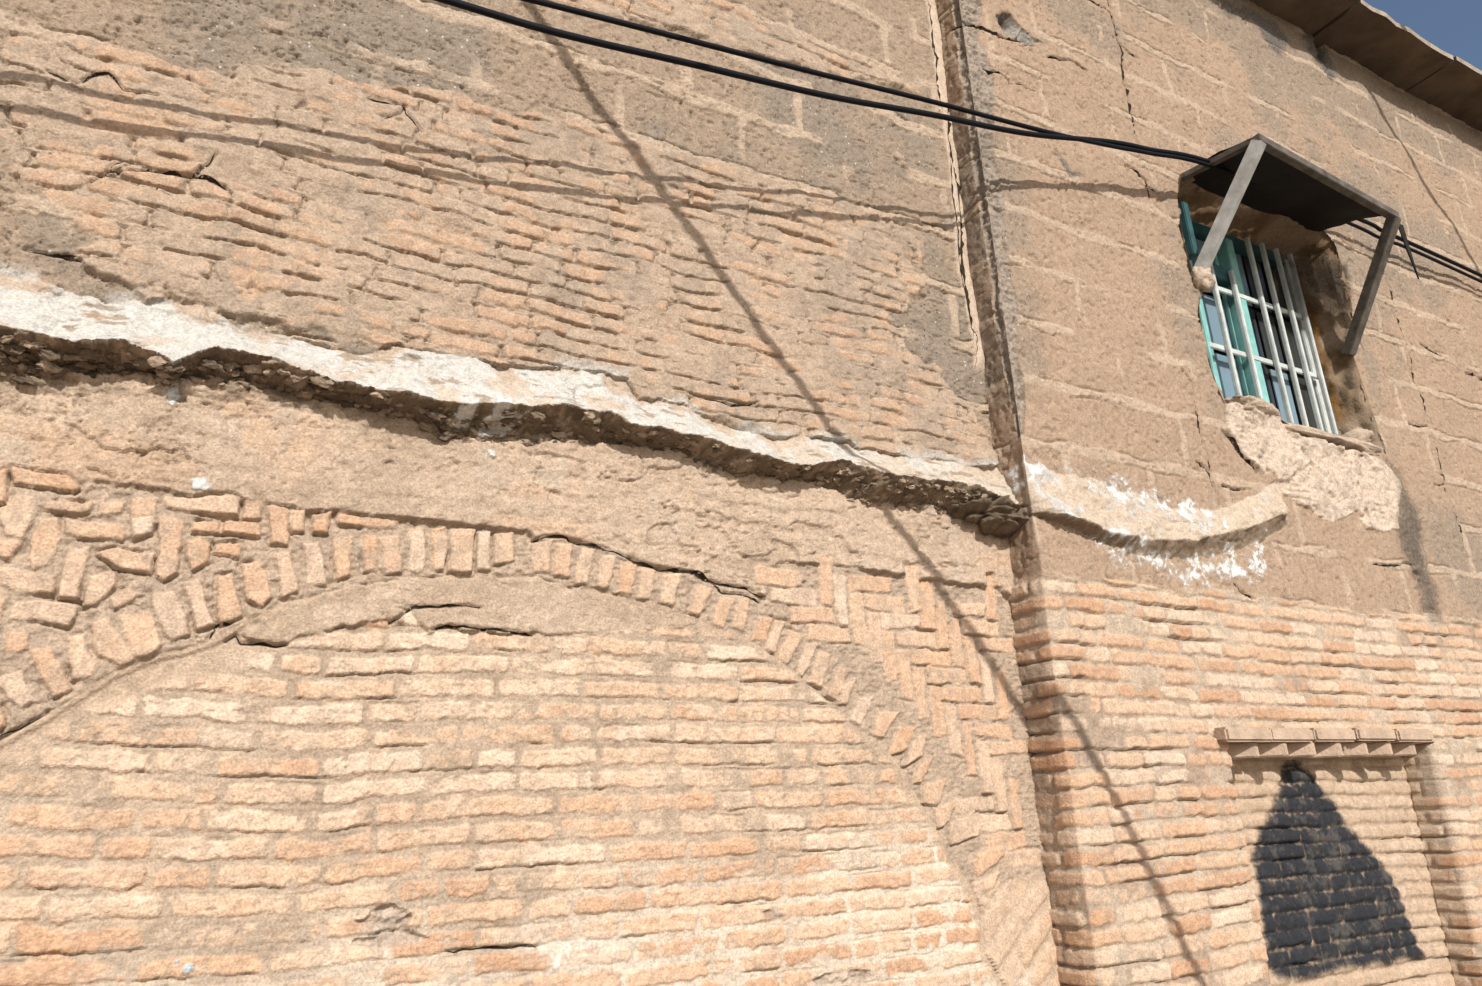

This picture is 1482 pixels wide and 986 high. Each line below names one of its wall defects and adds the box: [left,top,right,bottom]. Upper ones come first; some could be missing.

crack [48,72,155,96]
crack [93,153,232,197]
flaking render [1223,402,1403,533]
crack [534,535,763,603]
crack [209,622,283,648]
crack [390,604,530,636]
crack [0,715,45,736]